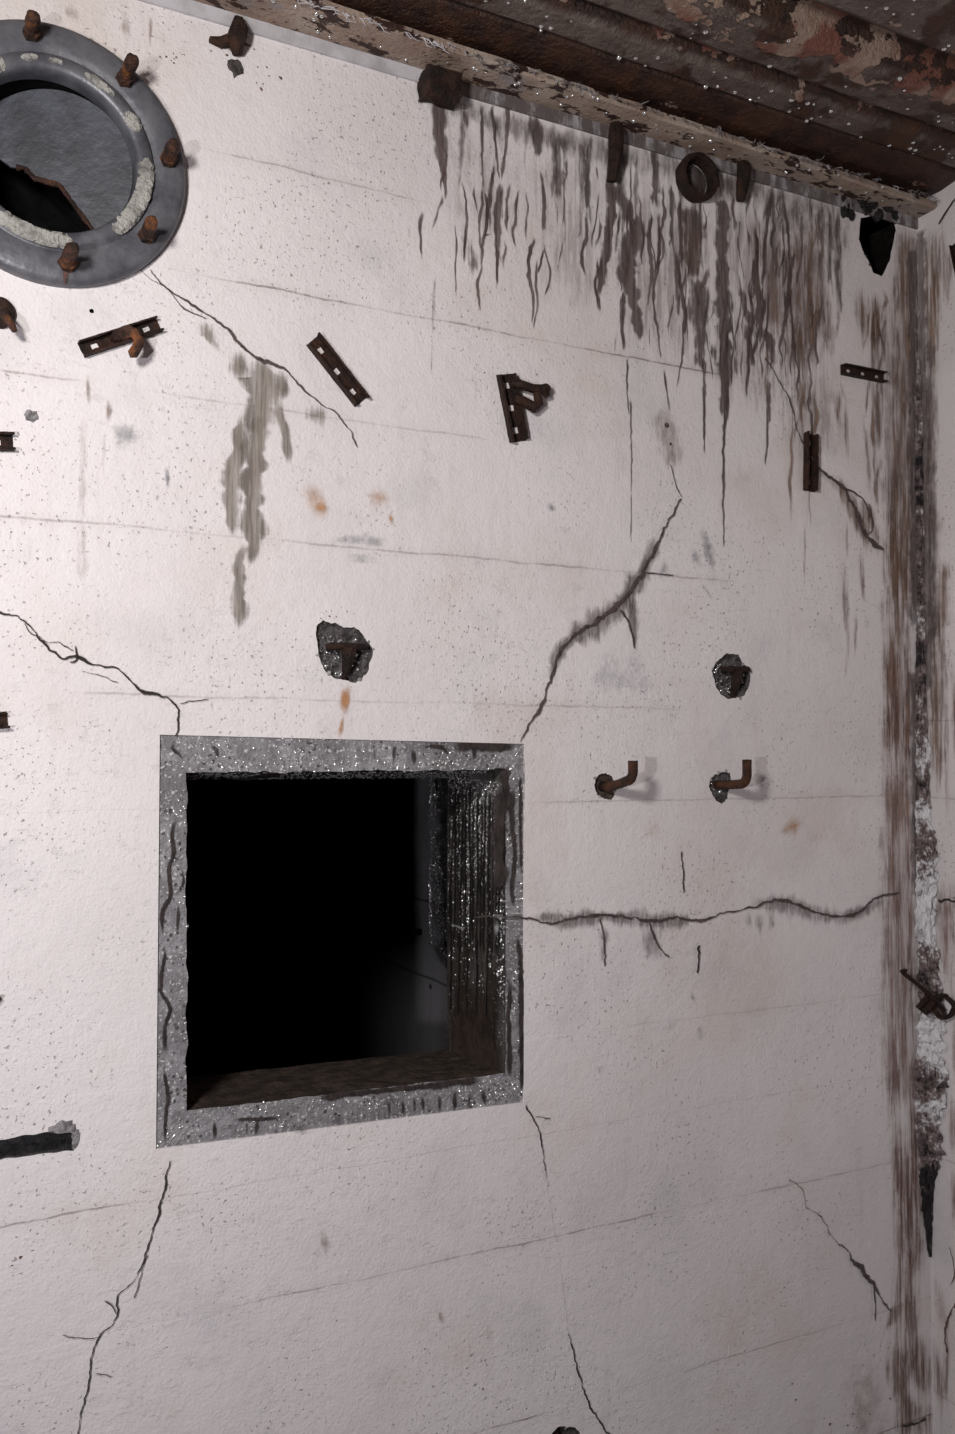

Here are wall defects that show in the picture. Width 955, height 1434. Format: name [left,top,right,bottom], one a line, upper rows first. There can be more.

crack [140,269,357,447]
leakage [224,357,291,624]
crack [0,611,208,736]
spalling [316,610,375,683]
crack [520,465,682,742]
spalling [712,653,753,700]
leakage [418,104,955,1434]
crack [475,892,899,966]
crack [63,1161,170,1434]
crack [790,1180,892,1320]
spalling [558,1426,580,1434]
crack [566,1317,610,1434]